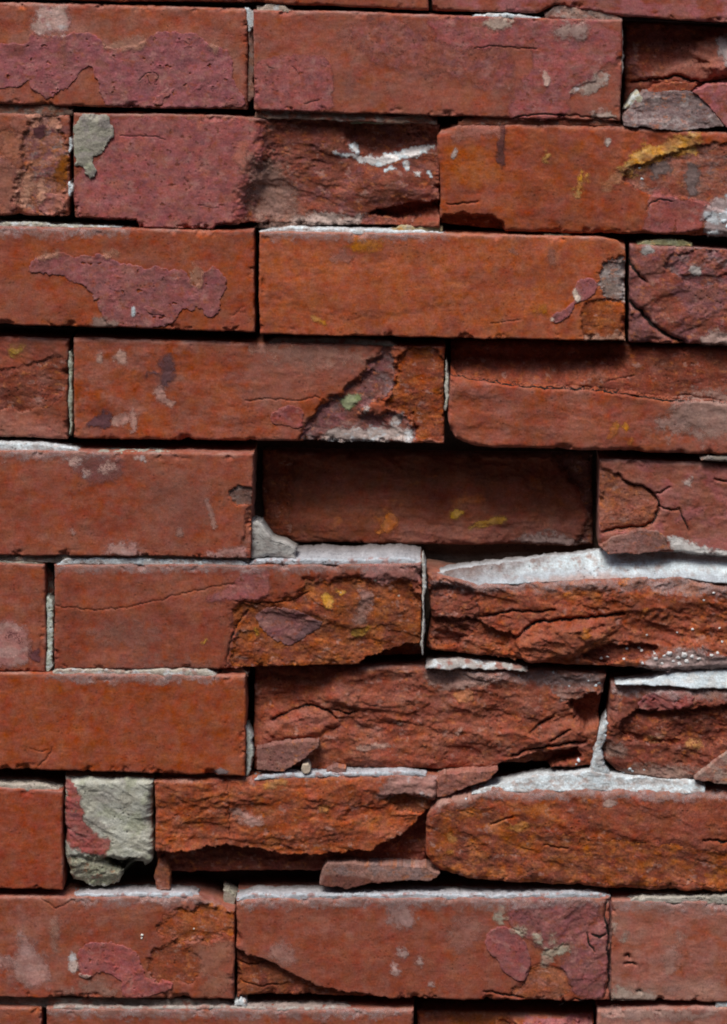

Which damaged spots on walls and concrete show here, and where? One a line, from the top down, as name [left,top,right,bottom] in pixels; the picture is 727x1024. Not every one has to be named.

peeling [0,31,503,229]
peeling [29,252,227,328]
spalling [665,248,727,287]
spalling [270,256,727,441]
crack [604,473,689,532]
spalling [206,568,481,667]
peeling [65,778,126,886]
peeling [77,902,234,998]
spalling [157,793,727,1024]